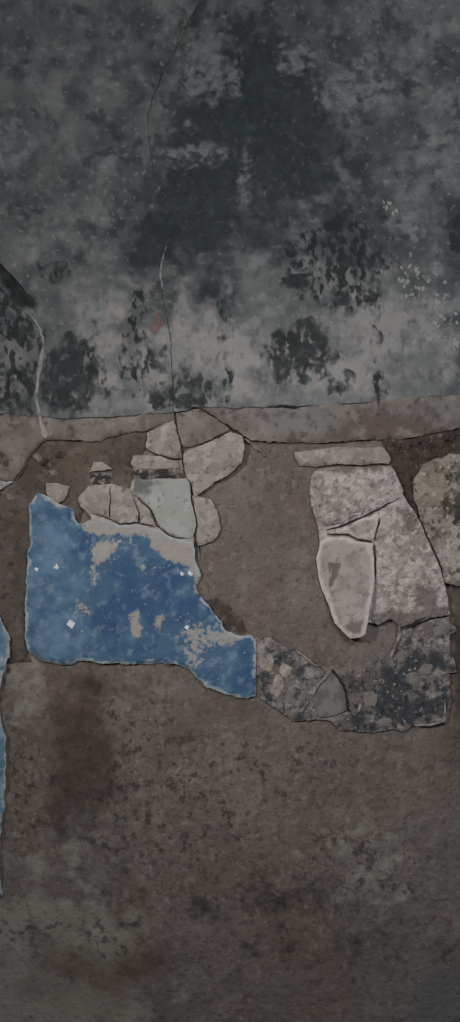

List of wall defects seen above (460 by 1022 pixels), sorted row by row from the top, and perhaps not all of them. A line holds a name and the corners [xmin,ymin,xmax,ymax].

damp [185,48,238,105]
damp [277,44,315,73]
damp [314,53,393,112]
damp [168,143,227,165]
crack [93,0,242,556]
mould [281,216,385,311]
damp [0,262,110,415]
damp [119,291,167,380]
damp [149,373,211,412]
mould [265,316,356,395]
flaking render [0,428,460,974]